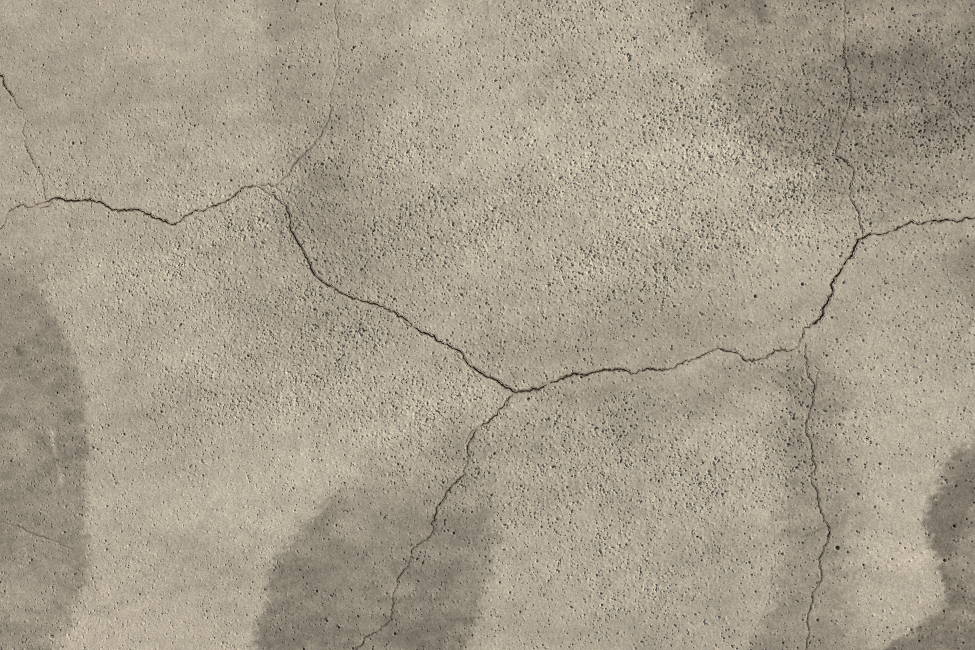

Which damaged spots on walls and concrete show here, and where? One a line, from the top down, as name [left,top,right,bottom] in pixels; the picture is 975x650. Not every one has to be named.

crack [0,0,975,394]
crack [0,521,73,550]
water stain [0,230,94,650]
water stain [250,423,501,650]
crack [354,394,514,650]
water stain [456,284,975,650]
crack [800,344,831,650]